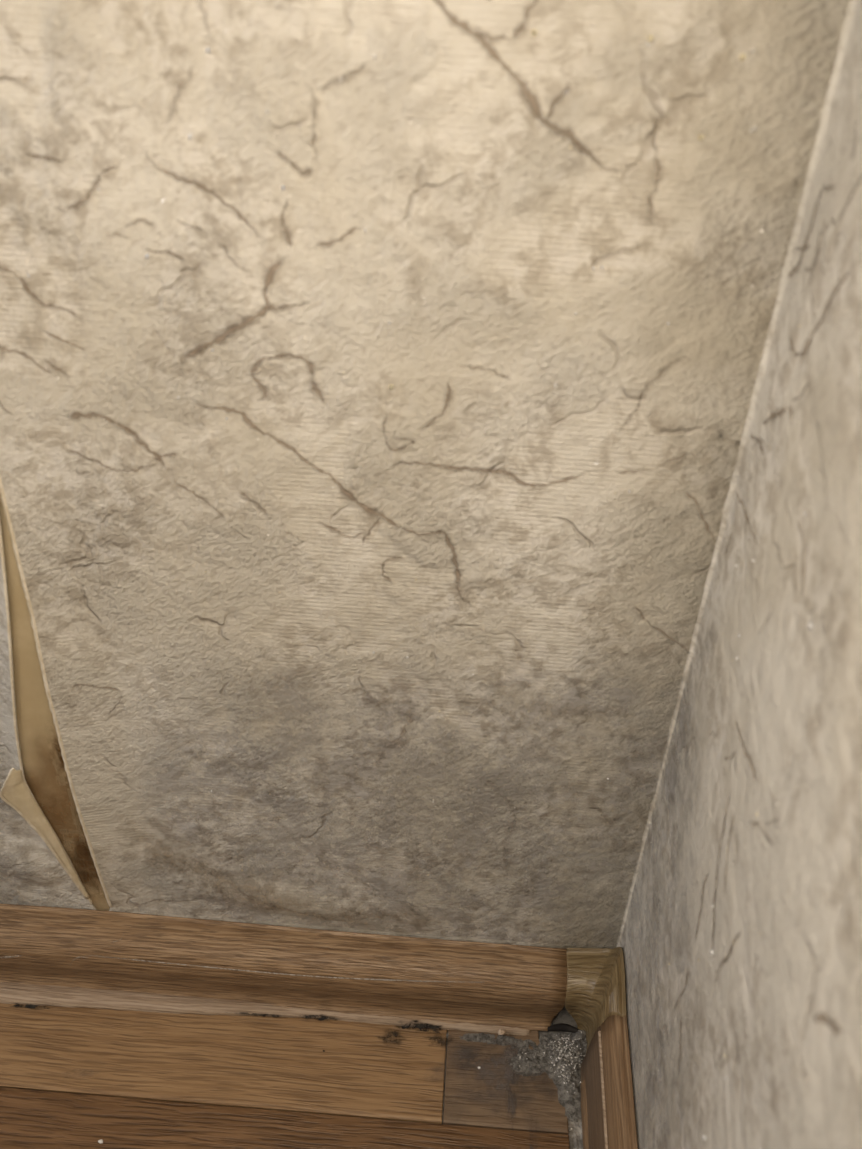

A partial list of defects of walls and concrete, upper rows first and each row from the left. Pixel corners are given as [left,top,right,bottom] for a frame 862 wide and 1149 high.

flaking render [0,495,110,911]